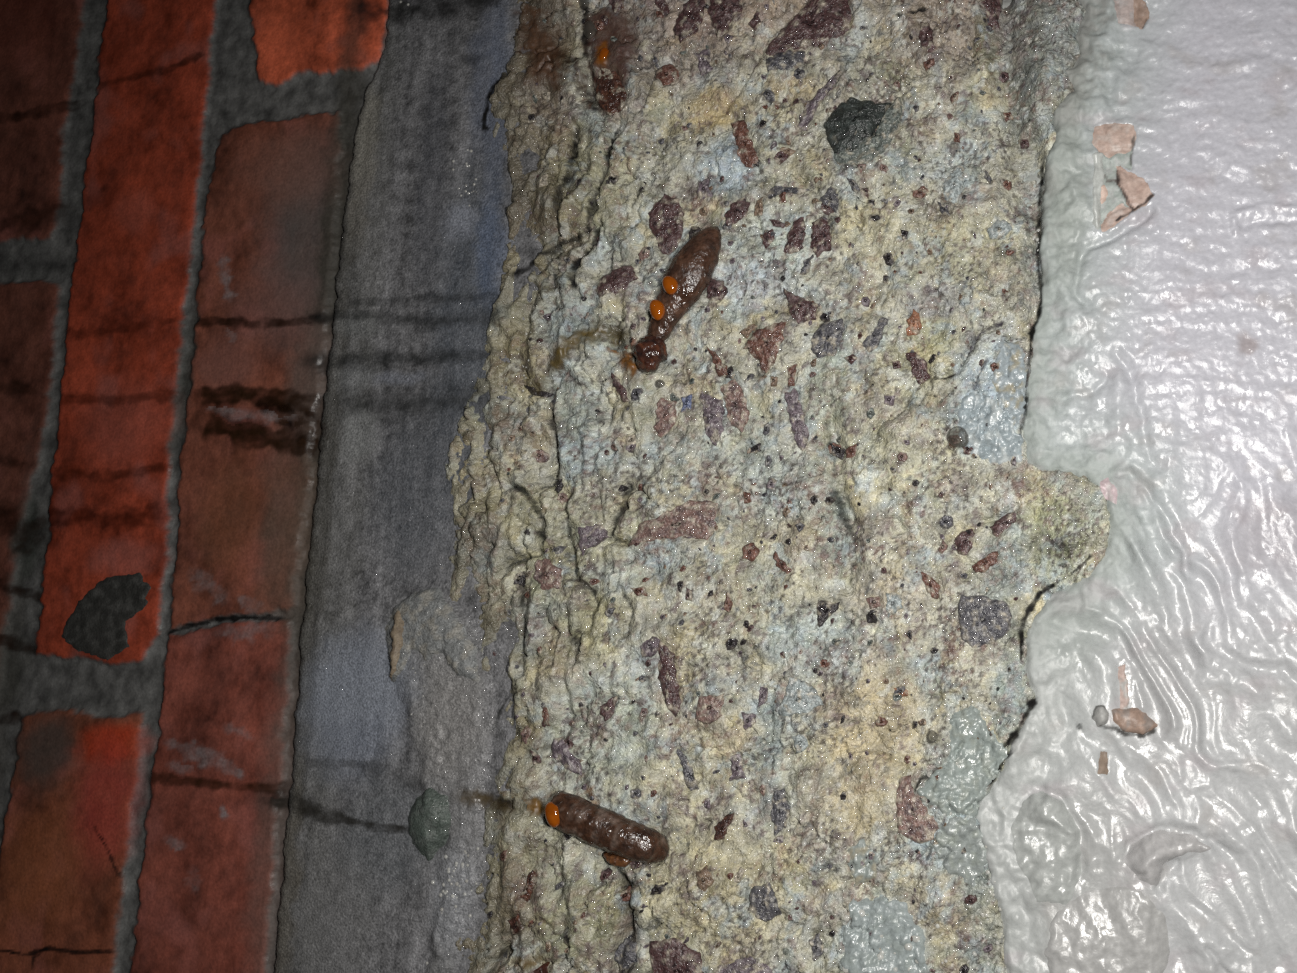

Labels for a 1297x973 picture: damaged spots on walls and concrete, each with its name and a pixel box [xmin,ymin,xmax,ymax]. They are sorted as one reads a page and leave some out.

spalling [445,0,1118,973]
crack [169,615,281,634]
crack [1018,556,1091,658]